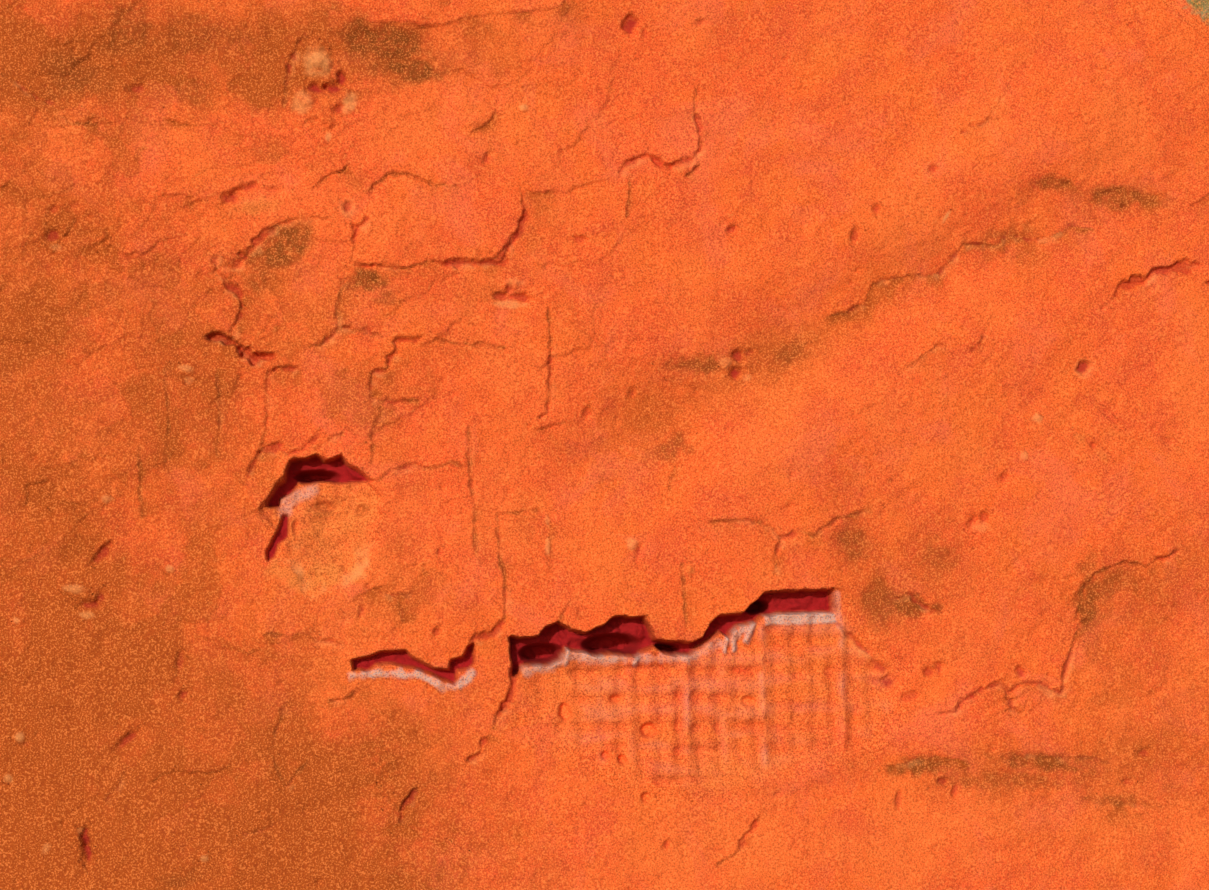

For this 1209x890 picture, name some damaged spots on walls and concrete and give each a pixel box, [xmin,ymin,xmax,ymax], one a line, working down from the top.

crack [614,83,709,226]
crack [815,219,1102,329]
crack [1107,258,1209,308]
crack [199,168,547,657]
crack [532,300,560,425]
flaking render [241,428,386,625]
crack [884,588,950,620]
flaking render [346,648,478,695]
flaking render [498,586,948,805]
crack [924,544,1187,814]
crack [878,751,977,774]